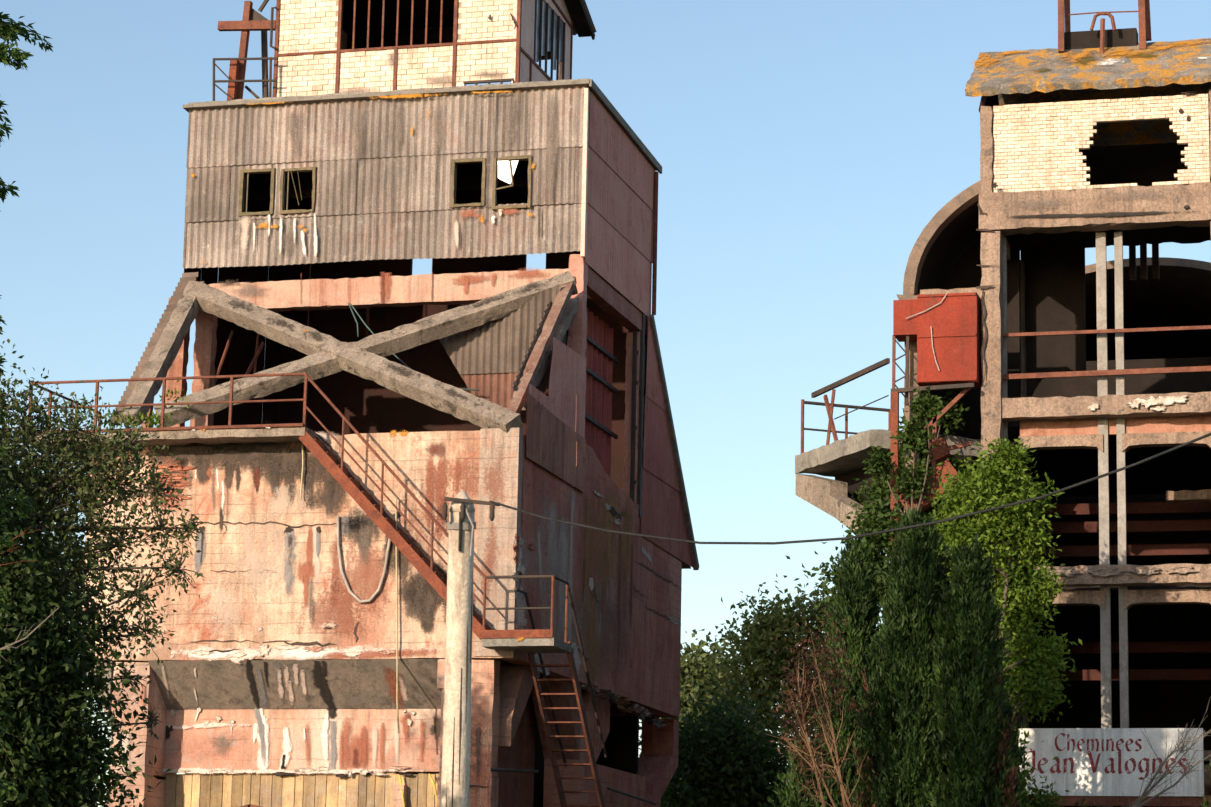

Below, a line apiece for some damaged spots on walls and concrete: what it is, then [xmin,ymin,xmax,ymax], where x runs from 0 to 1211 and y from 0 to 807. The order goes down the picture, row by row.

efflorescence [241,213,317,257]
spalling [1127,395,1189,412]
damp [148,428,447,634]
rust [297,536,388,634]
peeling [192,627,327,658]
damp [185,650,305,770]
damp [280,646,435,774]